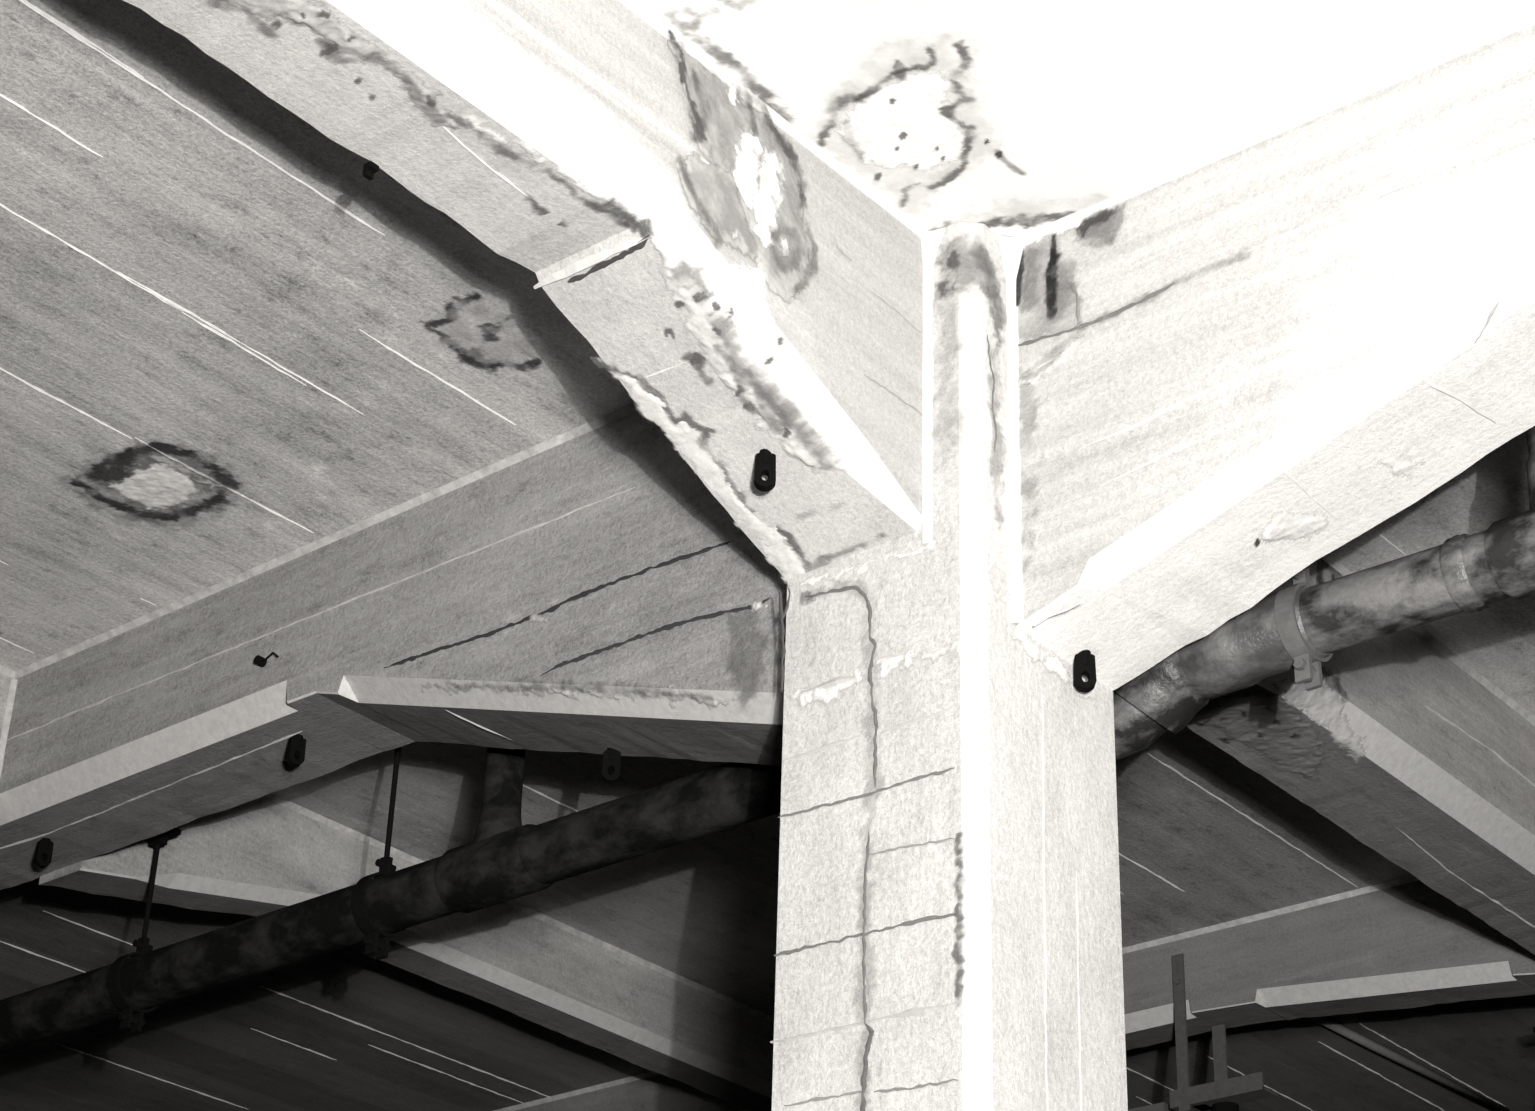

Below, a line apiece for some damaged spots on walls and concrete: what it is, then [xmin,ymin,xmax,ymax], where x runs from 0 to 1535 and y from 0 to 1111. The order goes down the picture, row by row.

water stain [707,47,736,64]
water stain [749,84,772,108]
water stain [818,41,1003,189]
water stain [425,293,541,372]
spalling [212,0,849,473]
water stain [937,244,1003,343]
water stain [70,442,240,521]
peeling [591,357,808,583]
crack [384,541,730,668]
crack [540,536,957,1111]